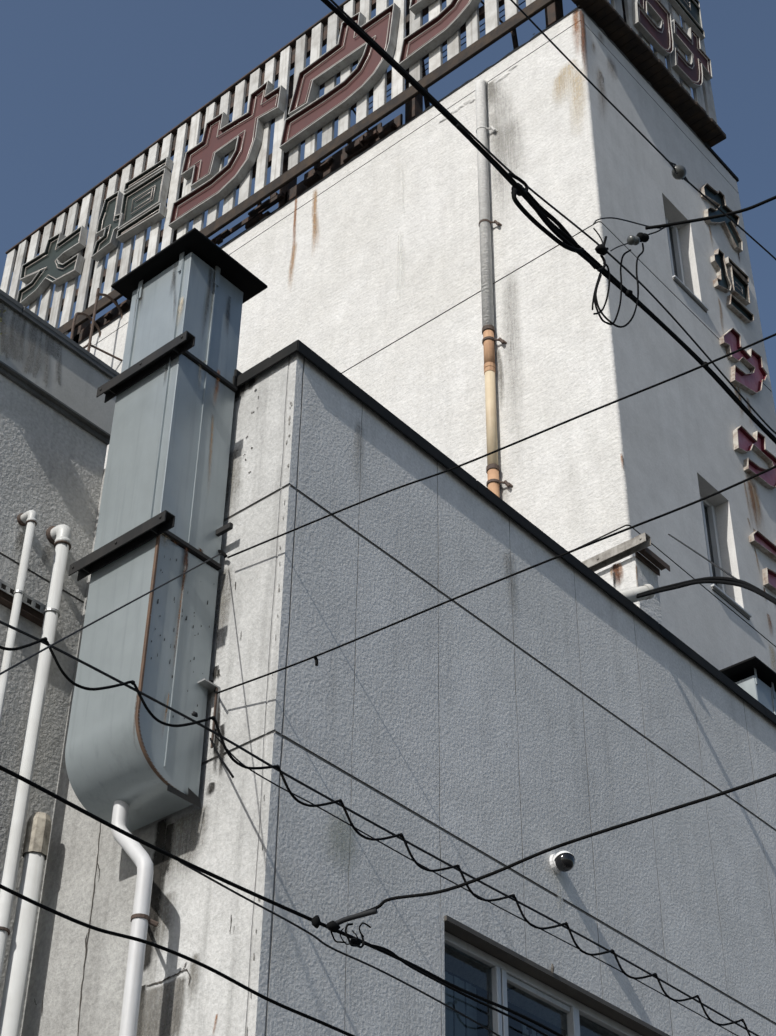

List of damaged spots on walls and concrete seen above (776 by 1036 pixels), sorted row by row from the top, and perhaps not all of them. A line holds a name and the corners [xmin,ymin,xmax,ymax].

rust [573,9,585,64]
leakage [213,698,224,769]
leakage [144,808,206,969]
leakage [136,955,197,1036]